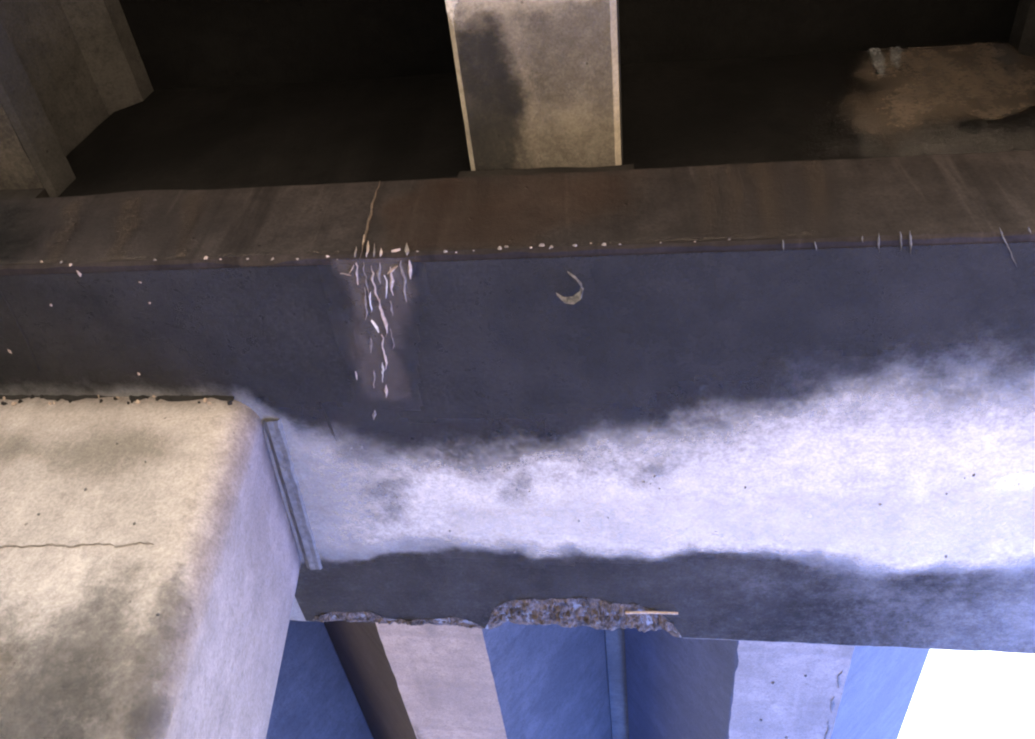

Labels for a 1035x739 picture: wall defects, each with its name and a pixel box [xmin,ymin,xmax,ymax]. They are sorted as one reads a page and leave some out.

crack [360,182,380,257]
efflorescence [340,234,418,397]
water stain [315,394,1035,570]
crack [0,541,154,549]
spalling [312,597,680,638]